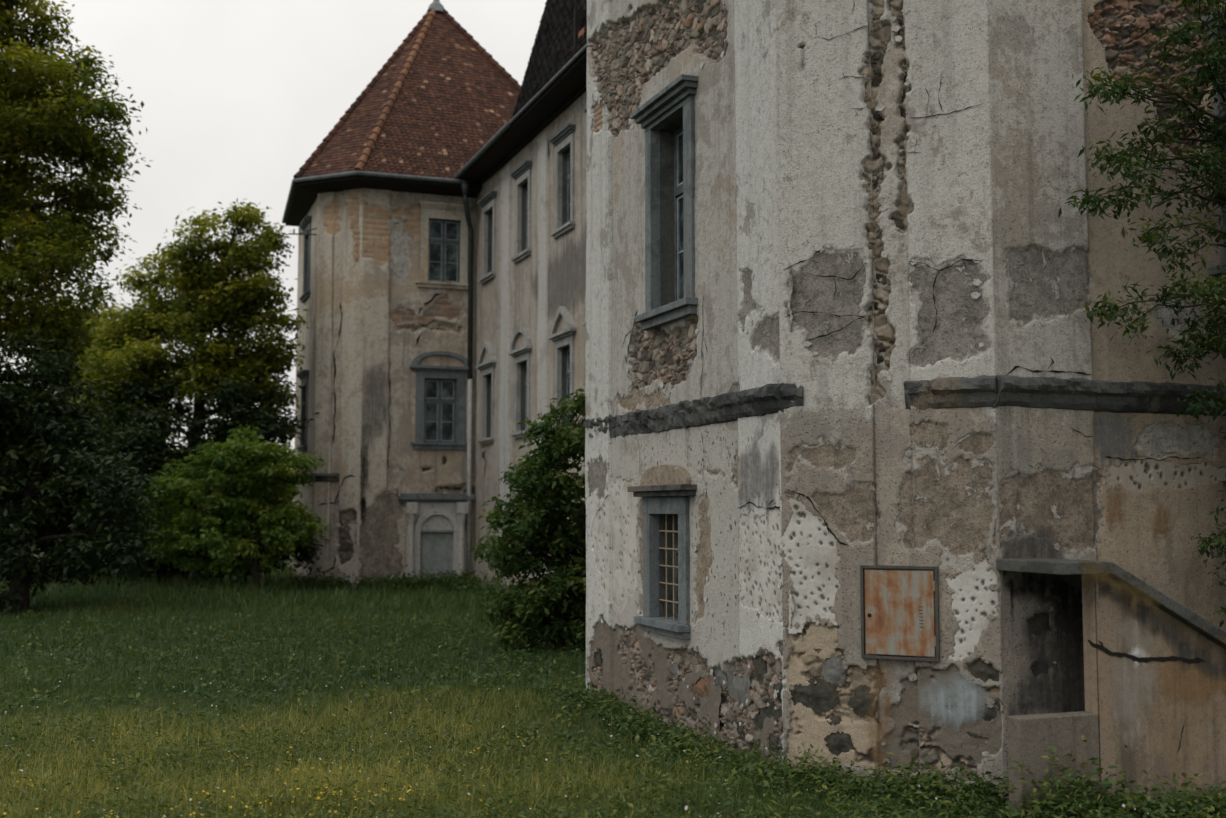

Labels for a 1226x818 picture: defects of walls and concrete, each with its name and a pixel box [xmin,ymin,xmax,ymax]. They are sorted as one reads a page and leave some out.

flaking render [552,0,728,137]
flaking render [1088,0,1218,170]
flaking render [739,0,914,405]
flaking render [389,294,464,334]
flaking render [612,316,698,412]
flaking render [908,255,992,368]
flaking render [1005,246,1093,326]
leakage [360,370,386,516]
flaking render [333,489,407,588]
flaking render [588,500,1007,779]
leakage [1002,529,1085,714]
crack [1088,640,1205,664]